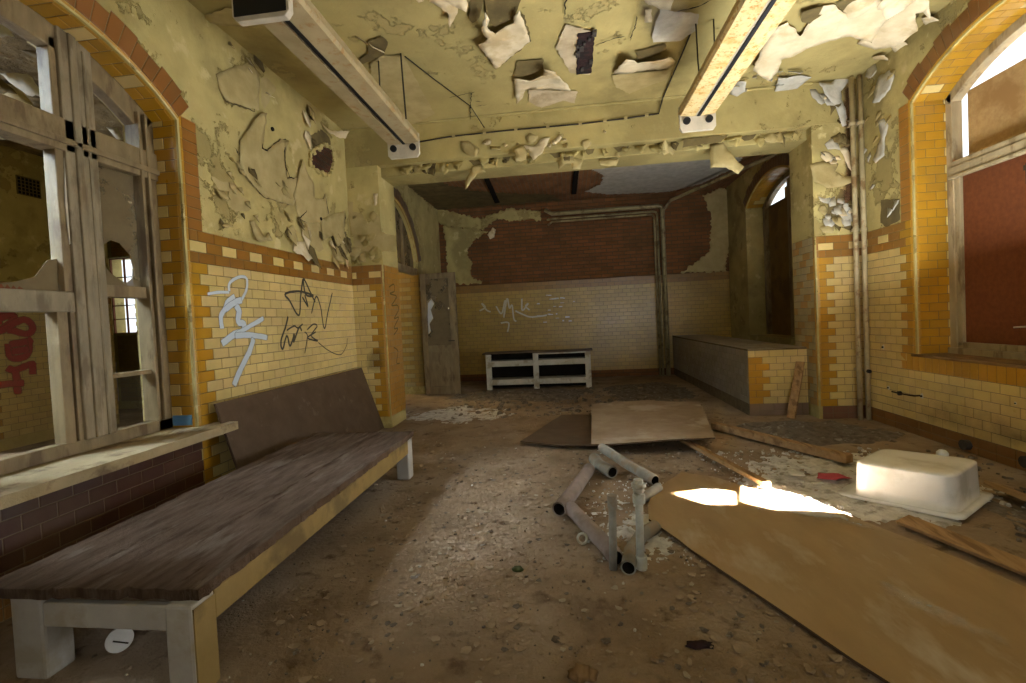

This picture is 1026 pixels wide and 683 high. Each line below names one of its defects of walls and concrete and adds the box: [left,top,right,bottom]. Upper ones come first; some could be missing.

peeling [0,72,40,106]
peeling [356,37,435,124]
peeling [417,0,591,108]
peeling [613,0,699,94]
peeling [730,0,939,233]
flaking render [399,131,795,285]